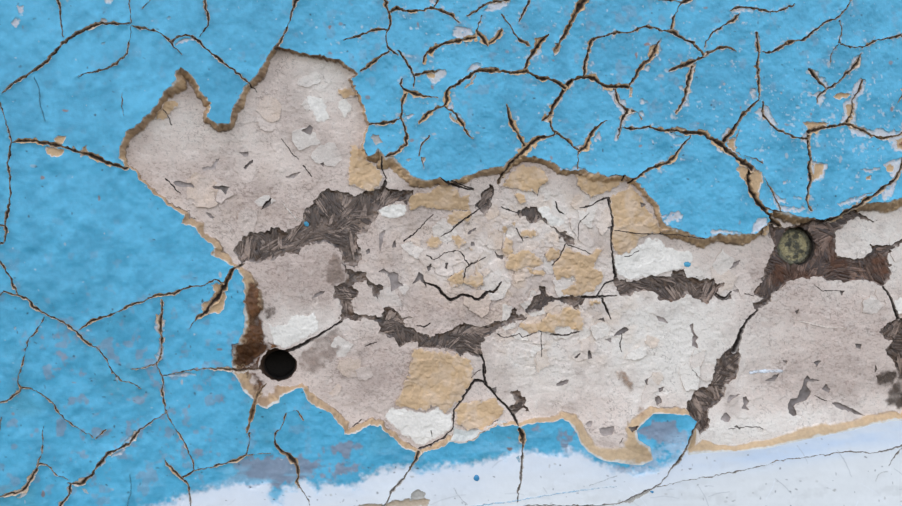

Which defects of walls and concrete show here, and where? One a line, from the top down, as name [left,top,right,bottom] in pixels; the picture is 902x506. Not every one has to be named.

crack [343,0,902,228]
crack [0,0,310,506]
rust [232,283,277,390]
peeling [119,46,902,501]
peeling [63,369,253,506]
peeling [358,489,430,506]
crack [383,449,422,506]
crack [516,427,902,506]